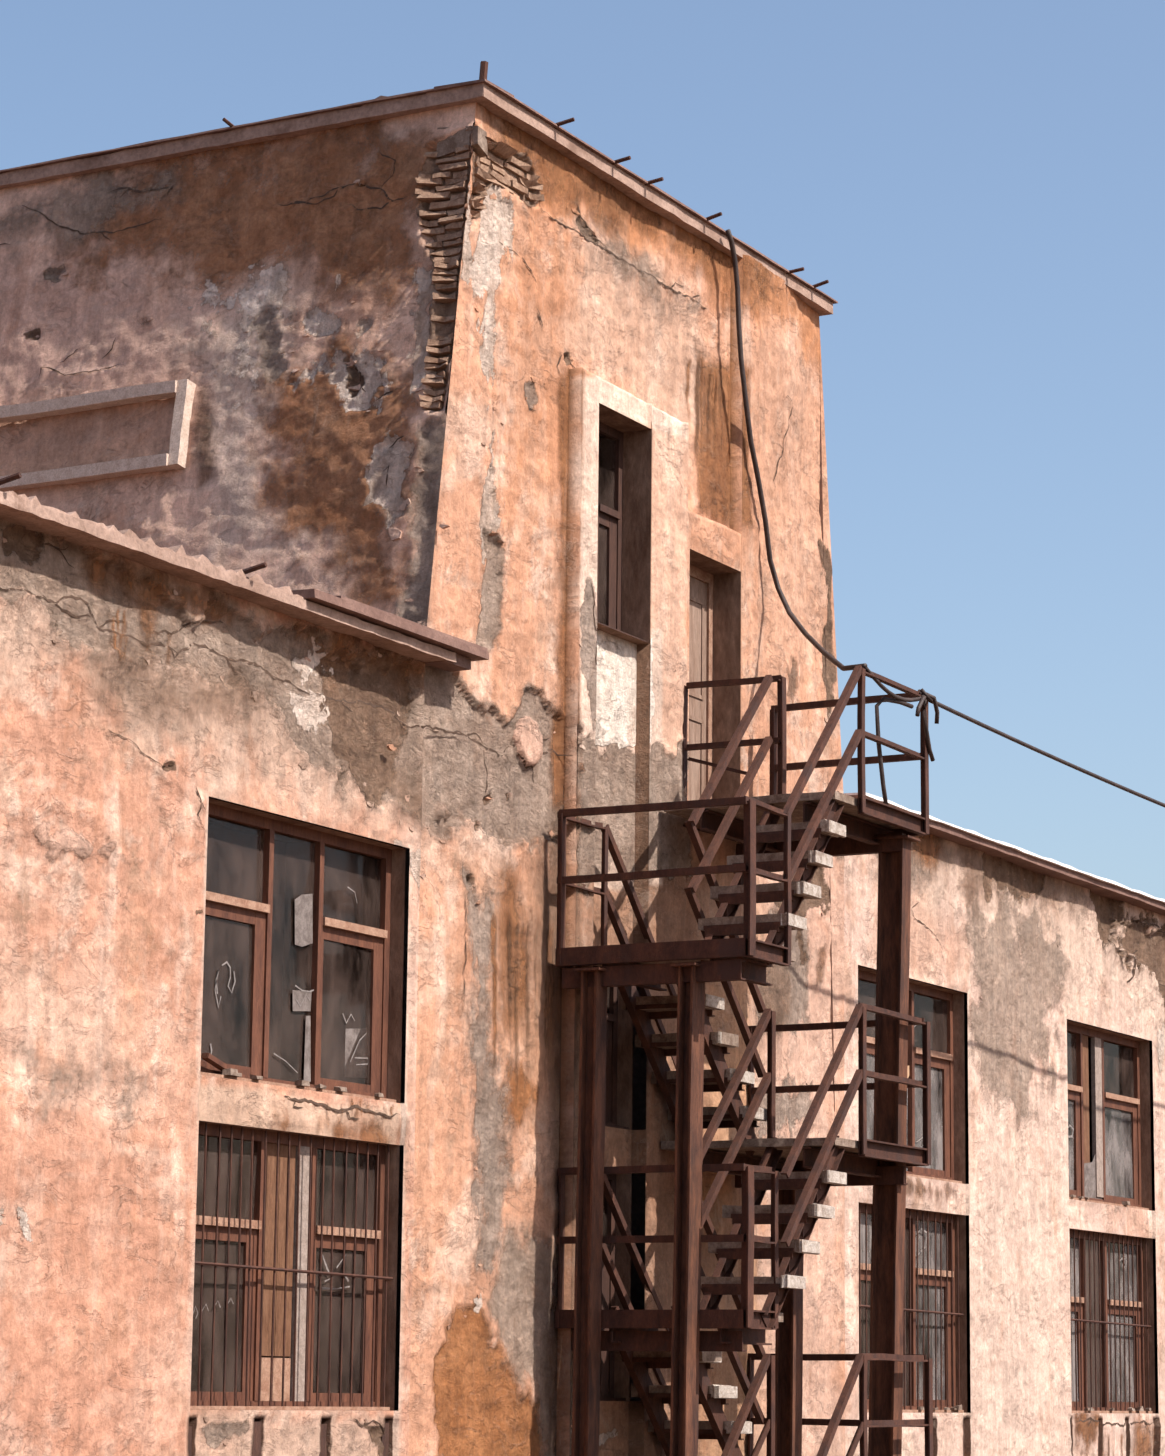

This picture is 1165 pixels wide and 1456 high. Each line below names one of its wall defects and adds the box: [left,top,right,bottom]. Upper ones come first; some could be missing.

crack [543,211,714,316]
flaking render [243,127,545,652]
crack [0,542,573,797]
damp [286,636,335,735]
flaking render [0,518,692,895]
flaking render [756,867,830,1034]
damp [960,848,996,897]
flaking render [1090,892,1165,1007]
peeling [433,867,573,1456]